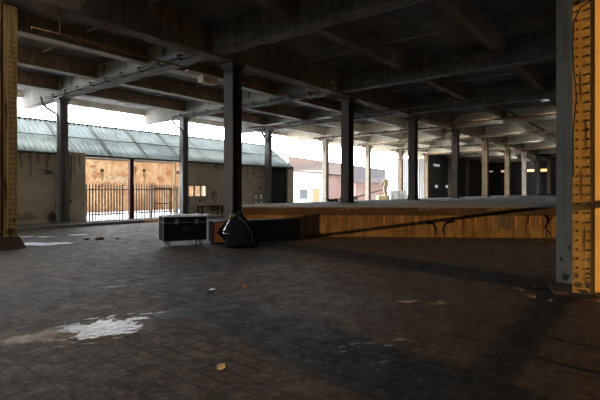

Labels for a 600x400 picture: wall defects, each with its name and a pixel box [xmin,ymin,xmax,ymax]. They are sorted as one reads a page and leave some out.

crack [426,219,455,236]
crack [544,215,554,237]